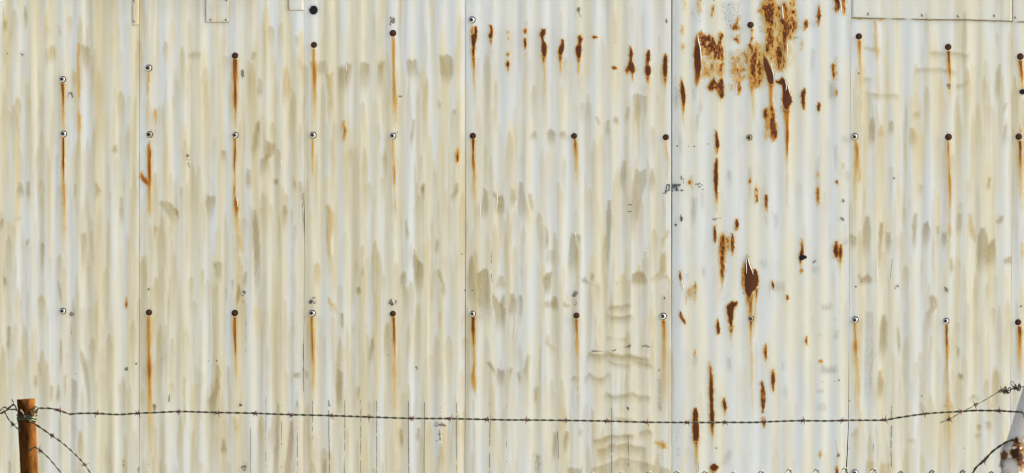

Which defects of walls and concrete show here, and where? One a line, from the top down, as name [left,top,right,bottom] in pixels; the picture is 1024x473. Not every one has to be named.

corrosion [523,28,598,74]
corrosion [611,46,668,89]
corrosion [680,0,821,191]
corrosion [140,141,152,211]
corrosion [833,241,843,264]
corrosion [713,219,775,428]
corrosion [692,363,727,467]